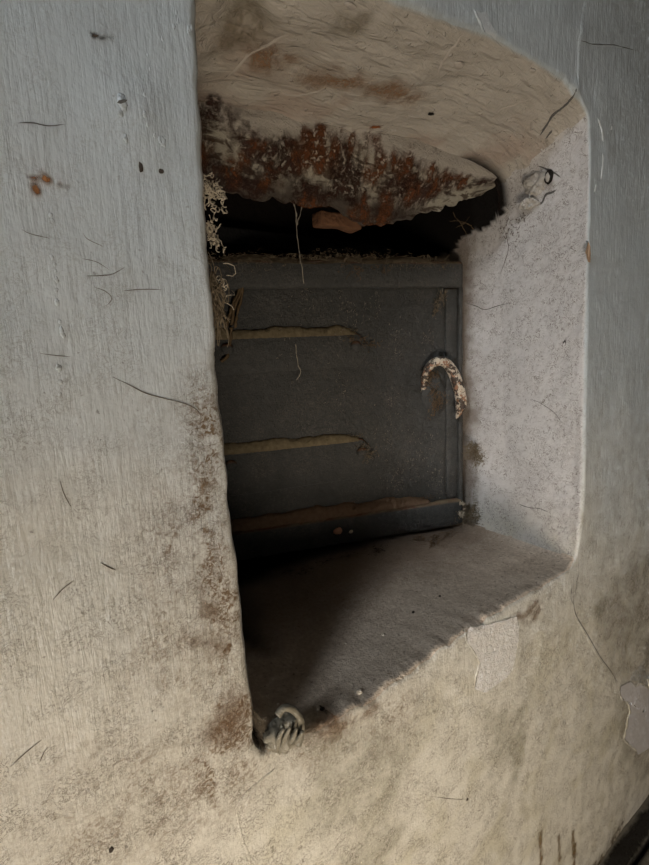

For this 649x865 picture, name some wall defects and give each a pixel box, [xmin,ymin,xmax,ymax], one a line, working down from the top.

crack [540,89,577,138]
corrosion [29,174,51,195]
corrosion [220,124,470,227]
peeling [462,617,519,693]
peeling [619,676,649,754]